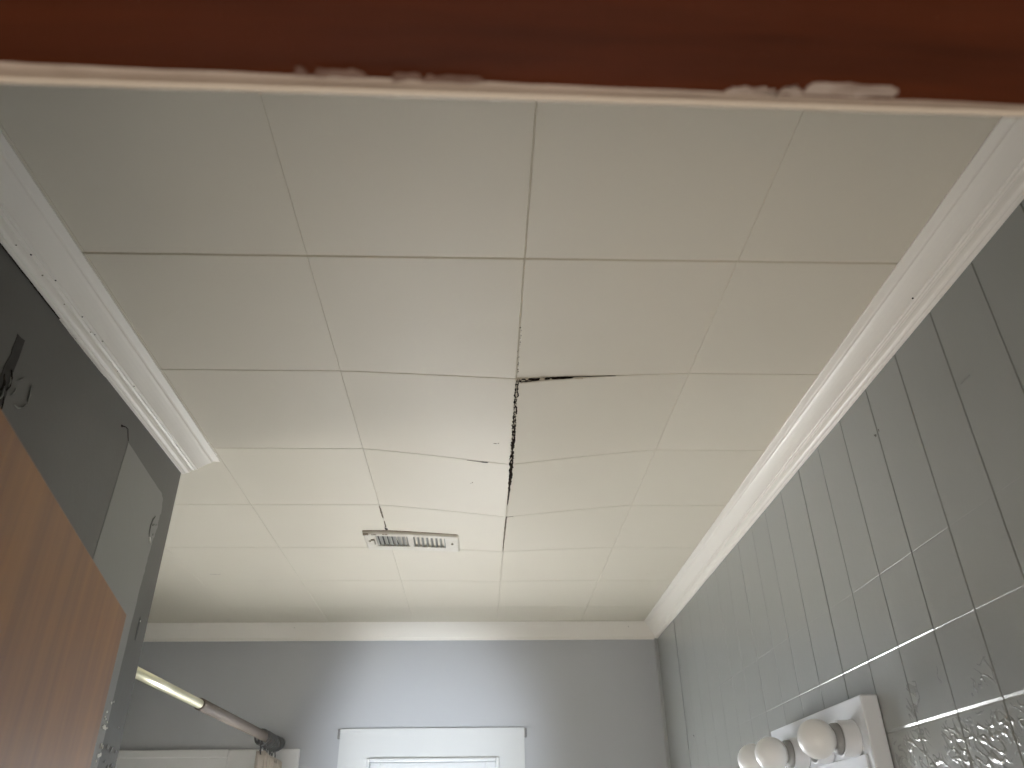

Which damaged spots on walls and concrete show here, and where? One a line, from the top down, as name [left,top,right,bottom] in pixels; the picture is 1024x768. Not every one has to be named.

crack [468,376,610,549]